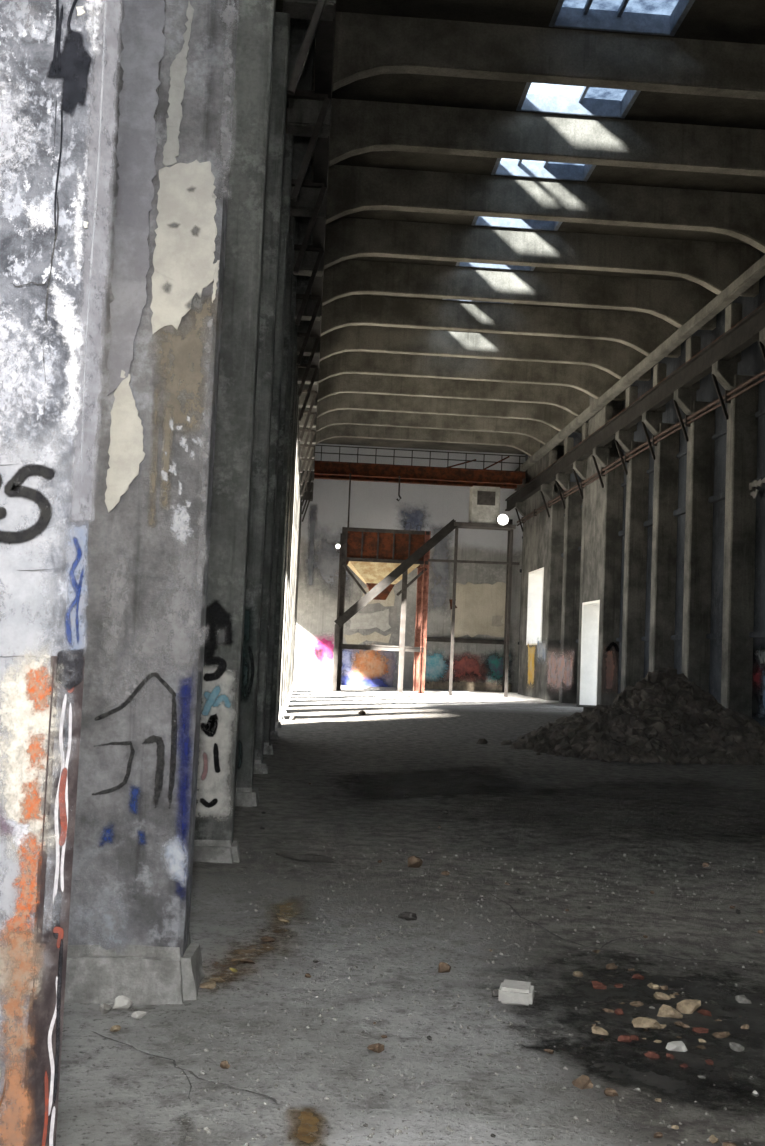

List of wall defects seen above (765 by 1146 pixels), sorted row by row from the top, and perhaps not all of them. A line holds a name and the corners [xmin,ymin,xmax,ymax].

peeling [0,0,220,522]
peeling [0,653,57,859]
corrosion [26,667,52,712]
peeling [0,934,40,996]
corrosion [0,734,45,1146]